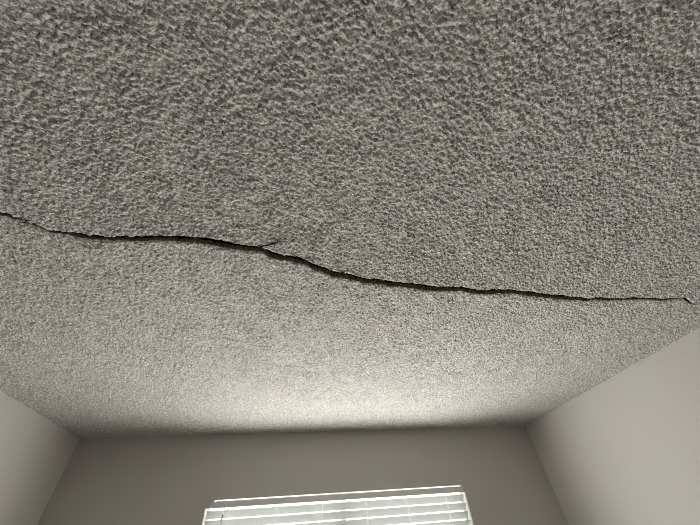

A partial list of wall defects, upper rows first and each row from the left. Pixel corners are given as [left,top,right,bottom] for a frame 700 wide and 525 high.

crack [0,212,697,304]